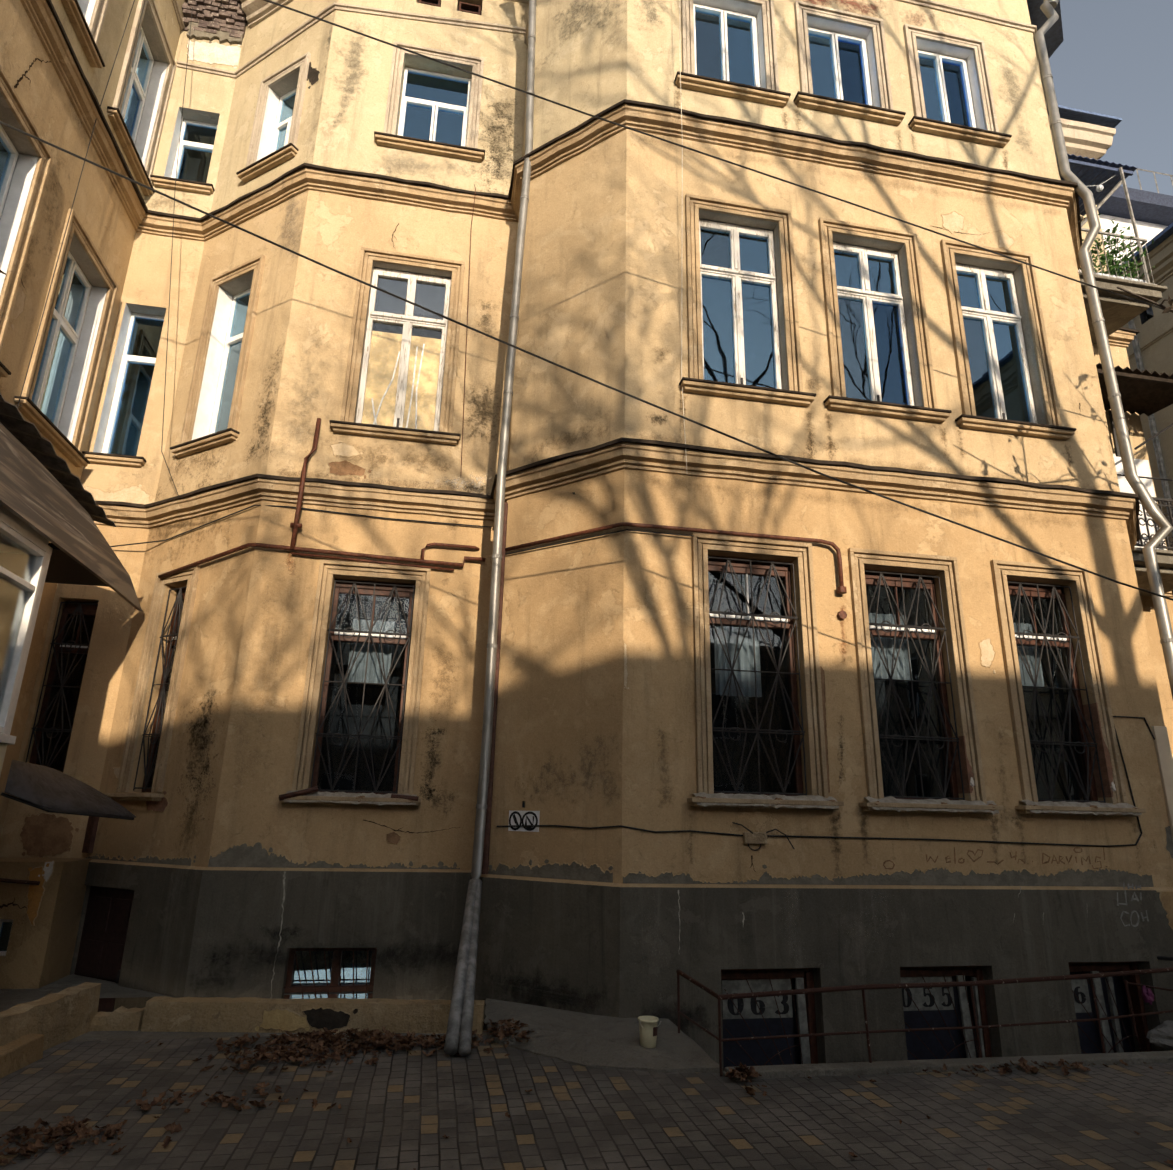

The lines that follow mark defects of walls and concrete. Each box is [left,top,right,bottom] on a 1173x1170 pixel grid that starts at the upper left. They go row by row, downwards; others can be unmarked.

crack [14,58,51,89]
peeling [328,441,371,479]
peeling [978,638,996,674]
damp [186,690,217,789]
flaking render [19,812,79,927]
peeling [488,859,1173,930]
crack [271,871,286,994]
flaking render [255,1006,358,1032]